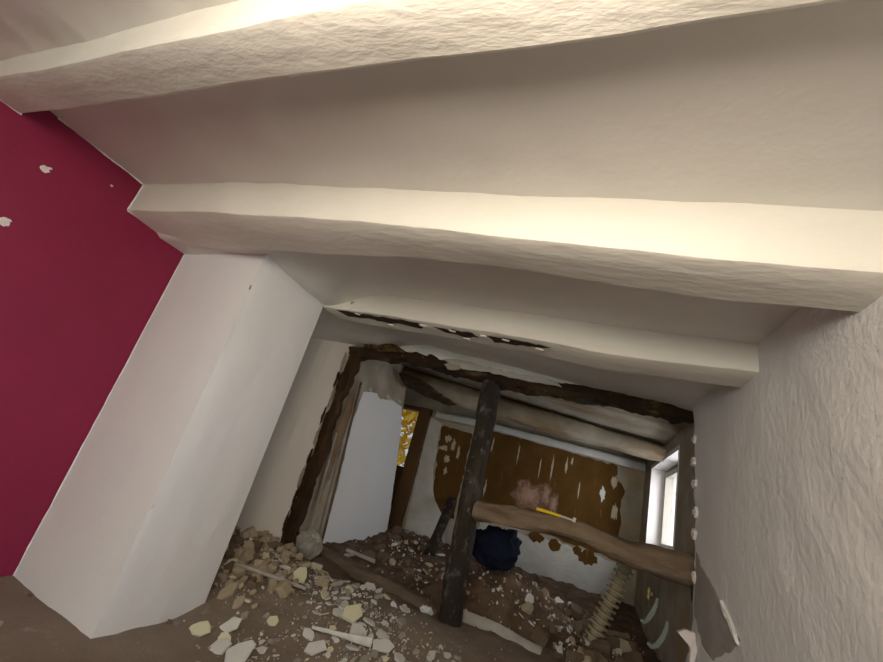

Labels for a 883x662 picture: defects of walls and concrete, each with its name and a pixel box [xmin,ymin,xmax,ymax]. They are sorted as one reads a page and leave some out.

flaking render [282,352,347,531]
peeling [323,388,402,543]
flaking render [362,343,405,353]
flaking render [399,373,458,406]
peeling [404,418,472,543]
flaking render [337,301,550,351]
flaking render [442,359,561,387]
peeling [480,431,625,536]
peeling [515,532,618,596]
flaking render [677,552,740,662]